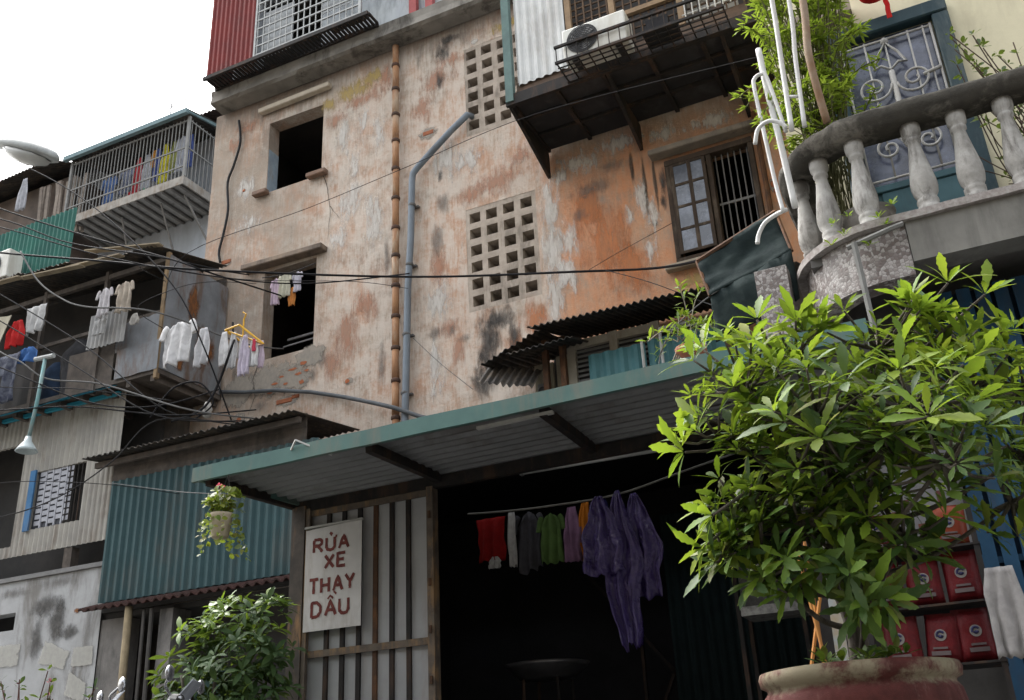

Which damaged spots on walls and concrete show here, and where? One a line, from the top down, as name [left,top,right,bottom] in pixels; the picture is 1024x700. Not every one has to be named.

spalling [418,127,437,140]
leakage [629,155,666,226]
peeling [220,315,357,424]
leakage [474,311,518,393]
leakage [30,598,75,656]